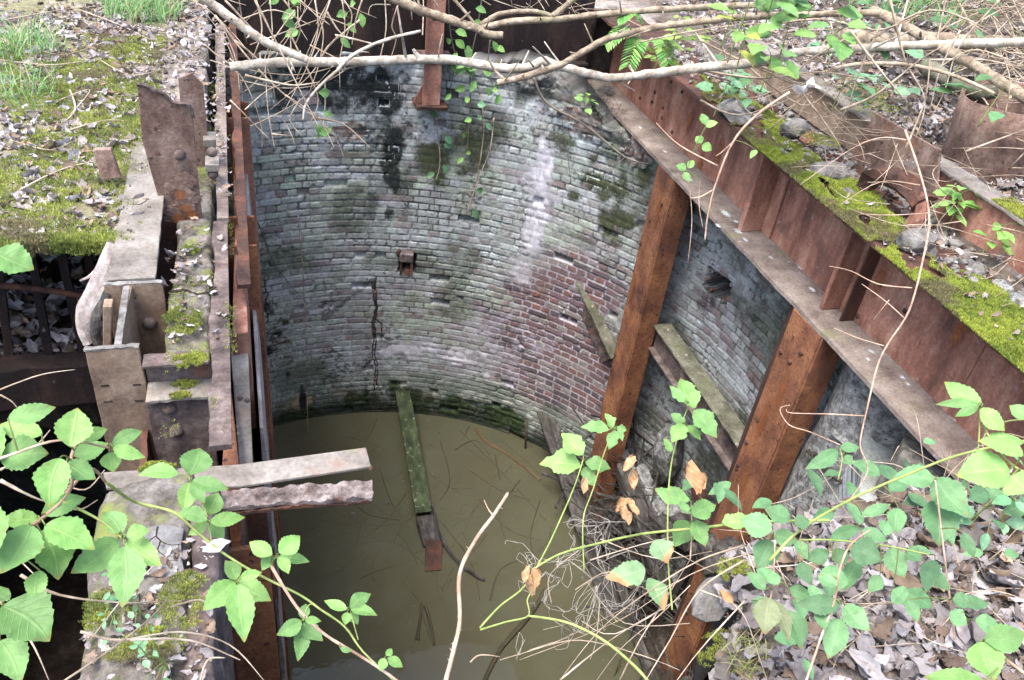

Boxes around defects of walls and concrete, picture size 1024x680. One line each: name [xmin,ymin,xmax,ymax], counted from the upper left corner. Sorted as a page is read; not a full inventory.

leakage [272,49,412,218]
efflorescence [508,136,561,284]
crack [364,276,384,409]
leakage [387,381,525,435]